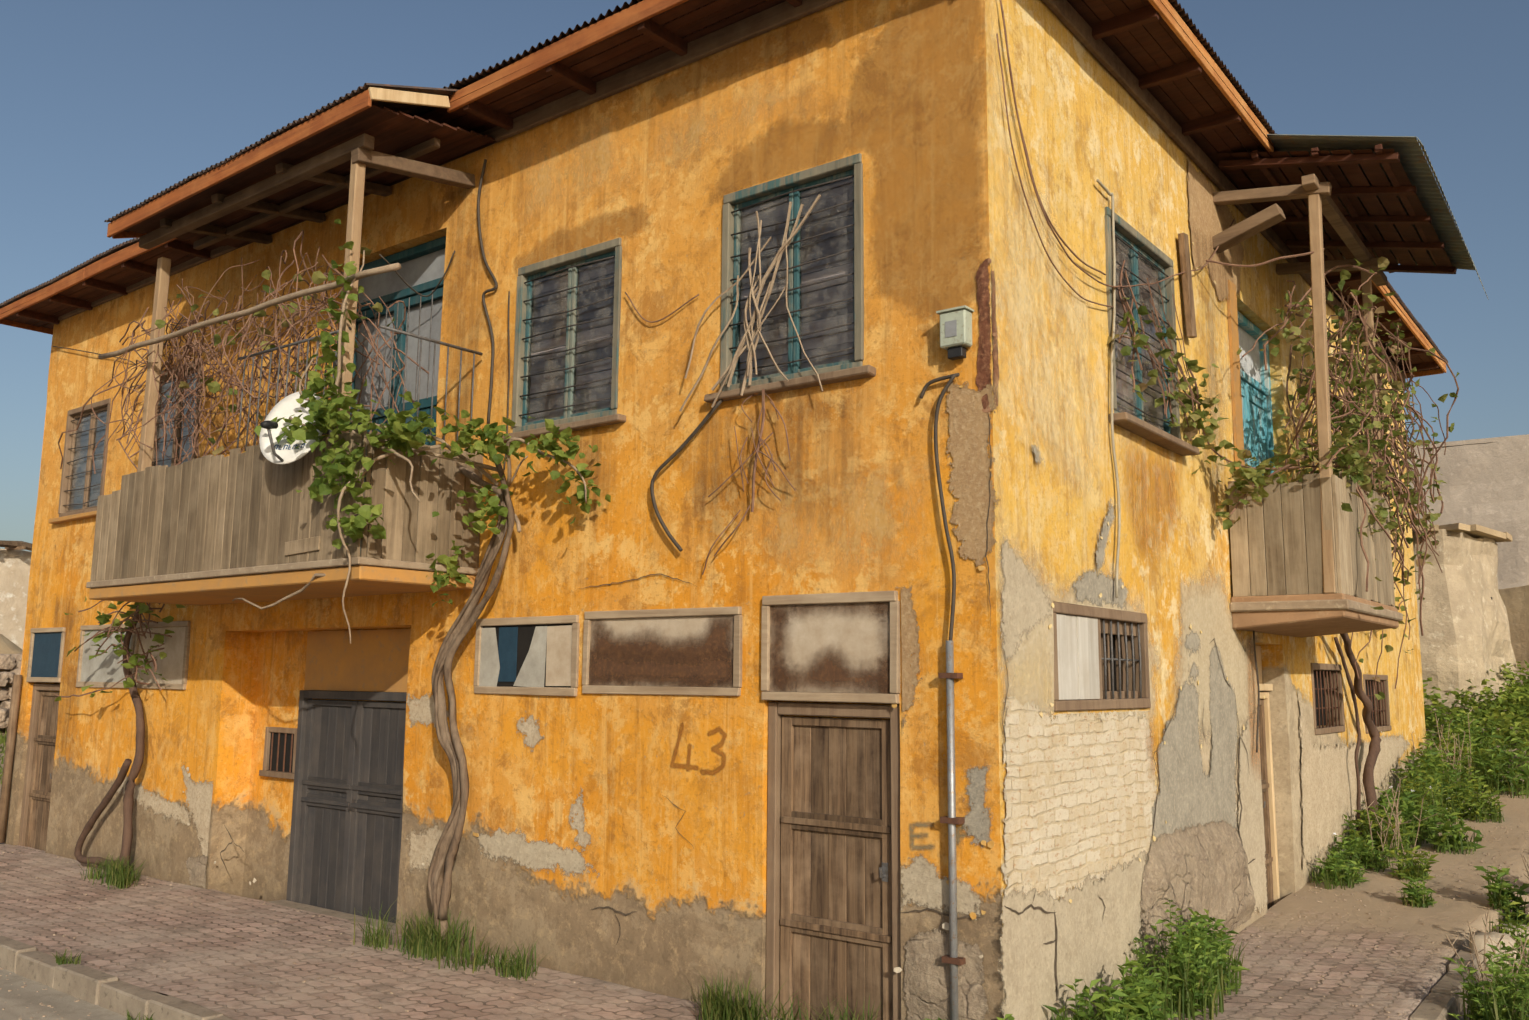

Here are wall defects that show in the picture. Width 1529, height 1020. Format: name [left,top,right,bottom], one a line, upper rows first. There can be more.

spalling [945,258,1267,914]
peeling [892,585,923,731]
peeling [117,765,216,871]
peeling [406,823,443,874]
peeling [516,714,545,752]
peeling [473,789,600,879]
peeling [1298,692,1411,869]
spalling [894,855,1004,1020]
crack [899,890,1058,1002]